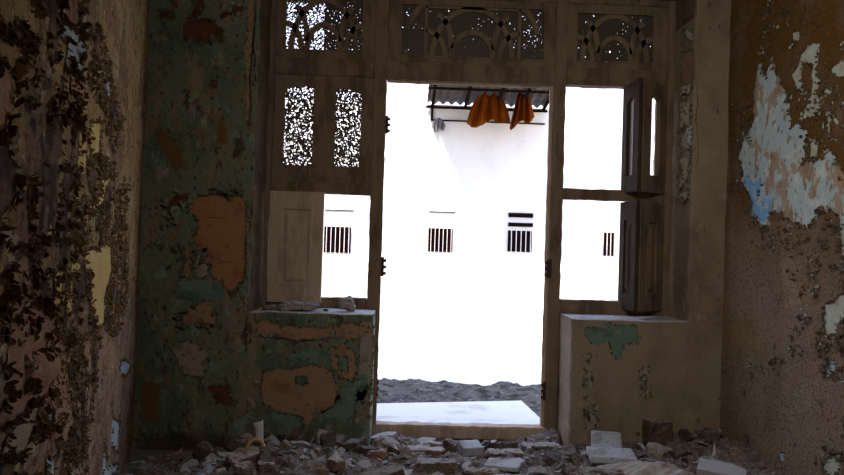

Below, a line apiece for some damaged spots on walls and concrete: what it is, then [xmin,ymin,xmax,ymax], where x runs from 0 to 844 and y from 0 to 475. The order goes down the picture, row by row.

peeling [161,185,249,293]
peeling [737,0,844,383]
peeling [170,299,236,407]
peeling [255,317,377,428]
peeling [581,322,639,430]
peeling [813,444,844,475]